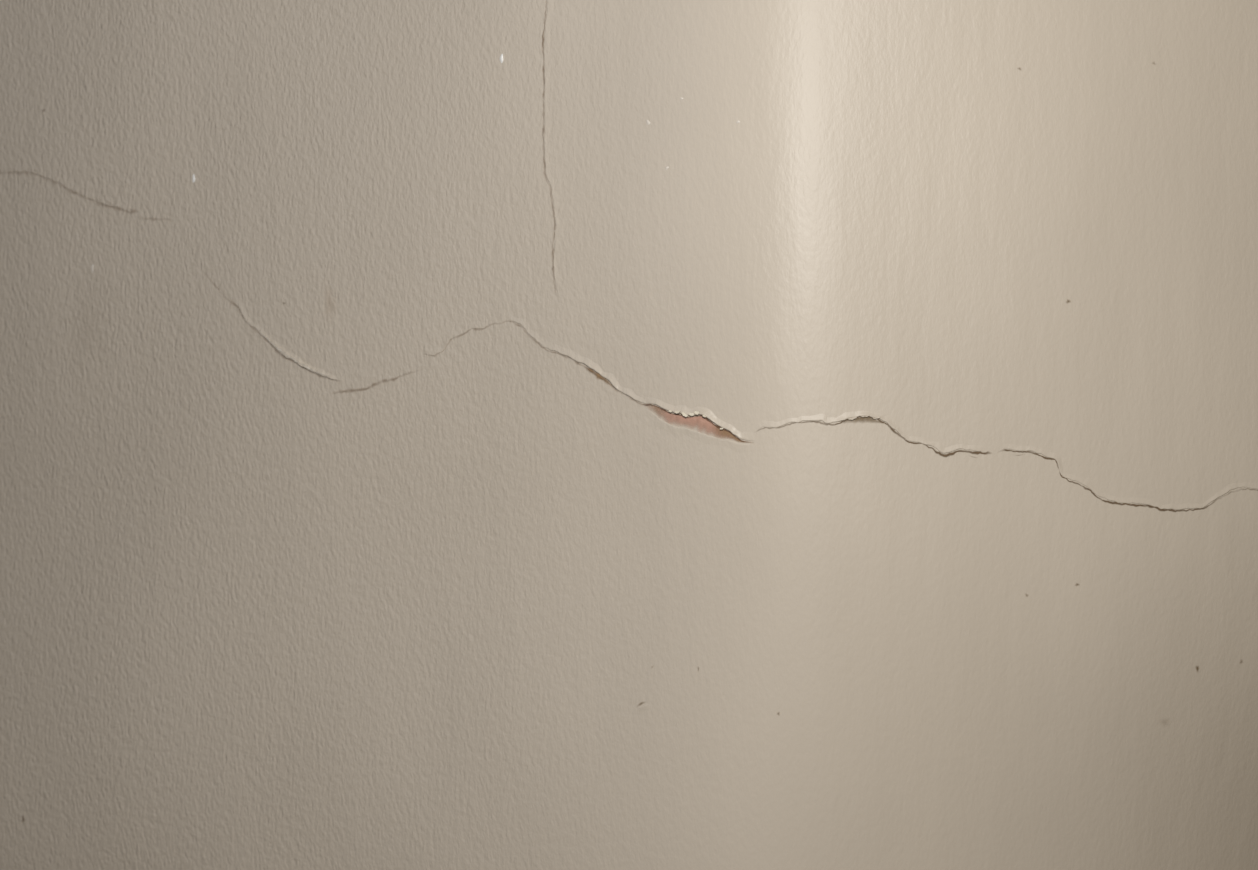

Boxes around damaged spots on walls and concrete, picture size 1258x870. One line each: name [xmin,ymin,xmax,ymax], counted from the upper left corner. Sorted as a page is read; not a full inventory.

peeling [638,396,756,453]
crack [755,411,1258,512]